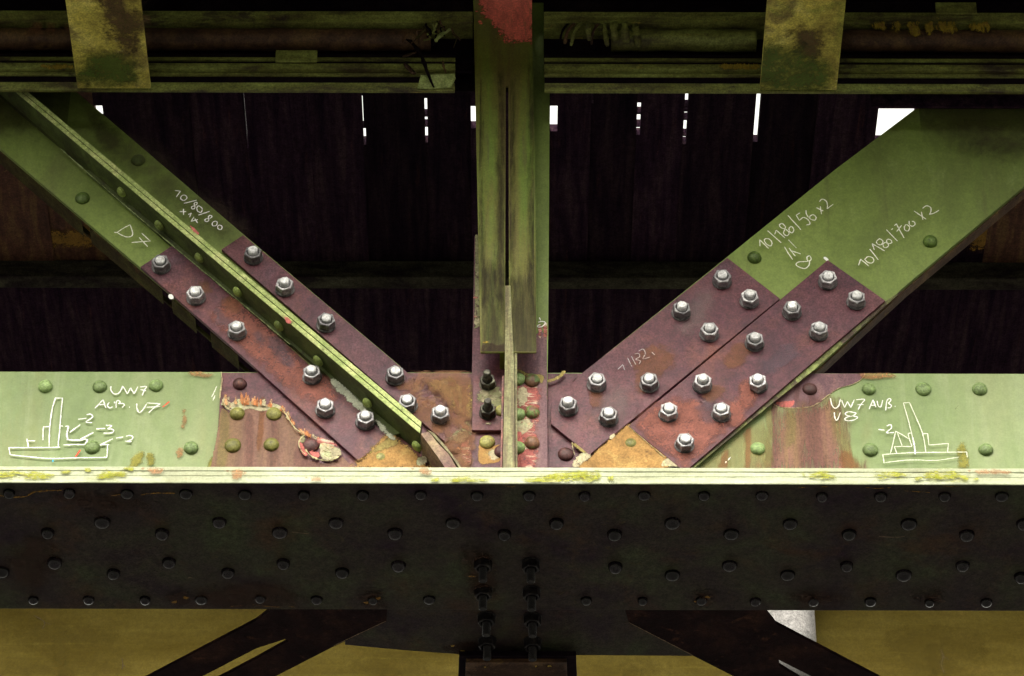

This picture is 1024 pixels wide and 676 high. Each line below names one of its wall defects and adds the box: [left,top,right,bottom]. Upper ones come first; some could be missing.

peeling [219,372,341,461]
corrosion [398,371,475,467]
peeling [514,369,566,468]
corrosion [756,373,896,468]